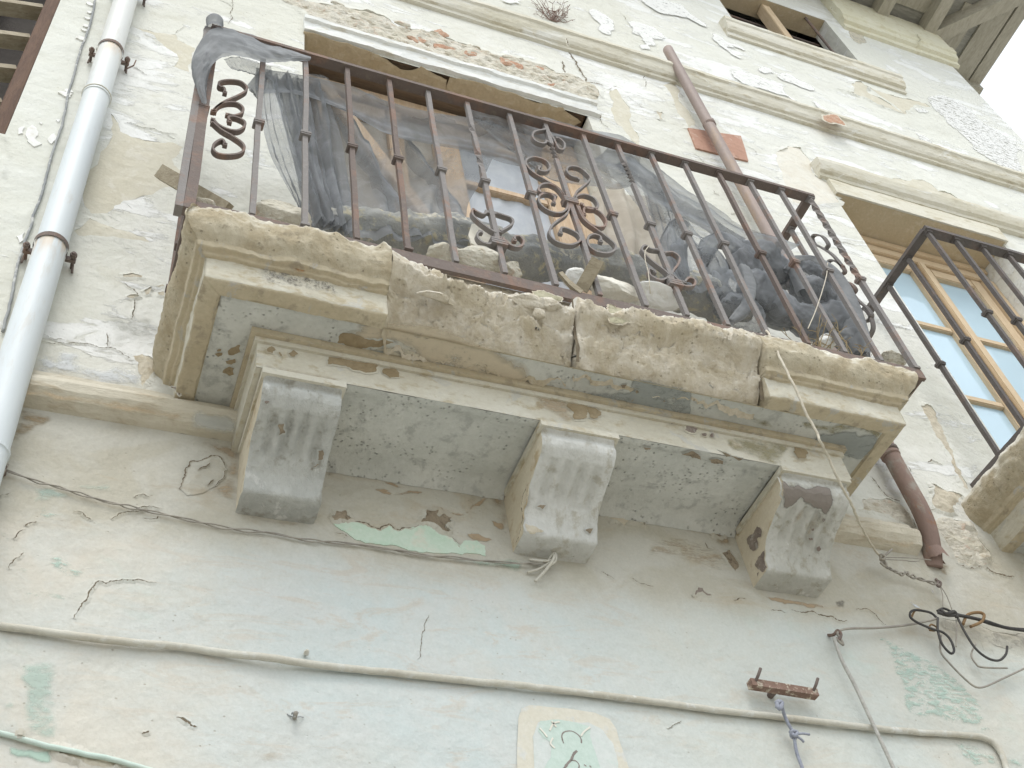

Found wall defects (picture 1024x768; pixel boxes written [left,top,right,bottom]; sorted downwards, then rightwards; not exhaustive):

flaking render [276,0,648,147]
peeling [837,80,1022,172]
peeling [70,113,185,251]
crack [122,282,140,320]
spalling [214,343,242,376]
crack [571,298,580,362]
peeling [327,506,519,568]
spalling [747,525,768,576]
spalling [778,477,835,553]
spalling [916,401,998,570]
crack [71,577,156,619]
crack [417,615,430,660]